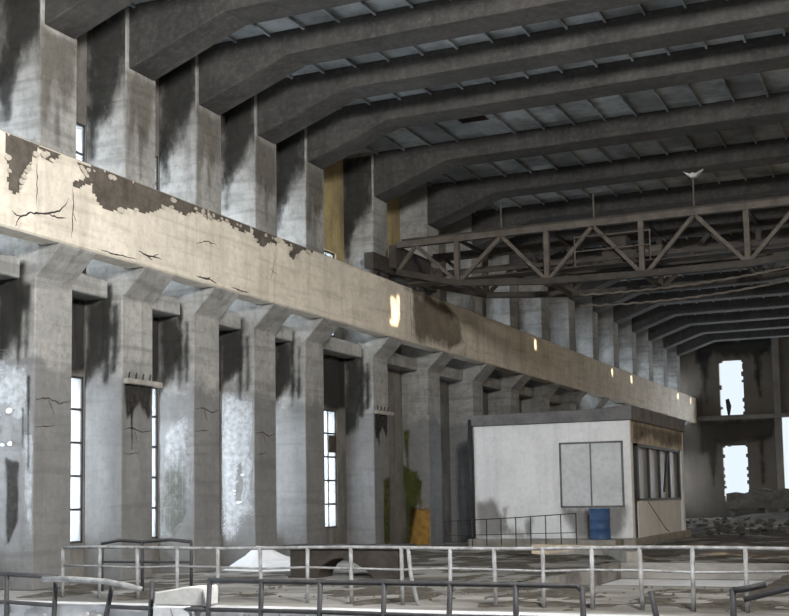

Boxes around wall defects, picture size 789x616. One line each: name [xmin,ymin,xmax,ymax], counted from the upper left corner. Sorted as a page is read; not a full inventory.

damp [0,70,12,120]
spalling [5,133,61,195]
damp [87,109,100,160]
crack [12,171,77,238]
spalling [73,162,313,260]
damp [75,302,84,367]
damp [103,285,118,383]
damp [414,293,462,348]